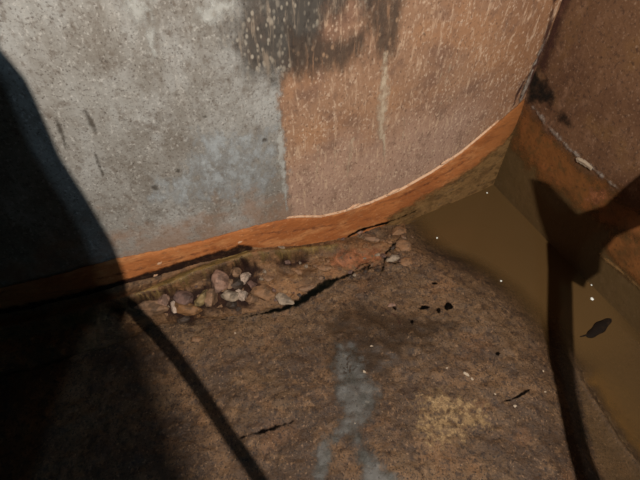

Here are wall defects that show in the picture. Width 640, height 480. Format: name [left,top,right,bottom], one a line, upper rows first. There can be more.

damp [235,0,363,74]
damp [365,0,401,155]
damp [528,72,554,122]
rust [0,0,640,309]
damp [550,128,615,187]
crack [221,243,401,320]
crack [240,421,294,439]
damp [313,306,438,480]